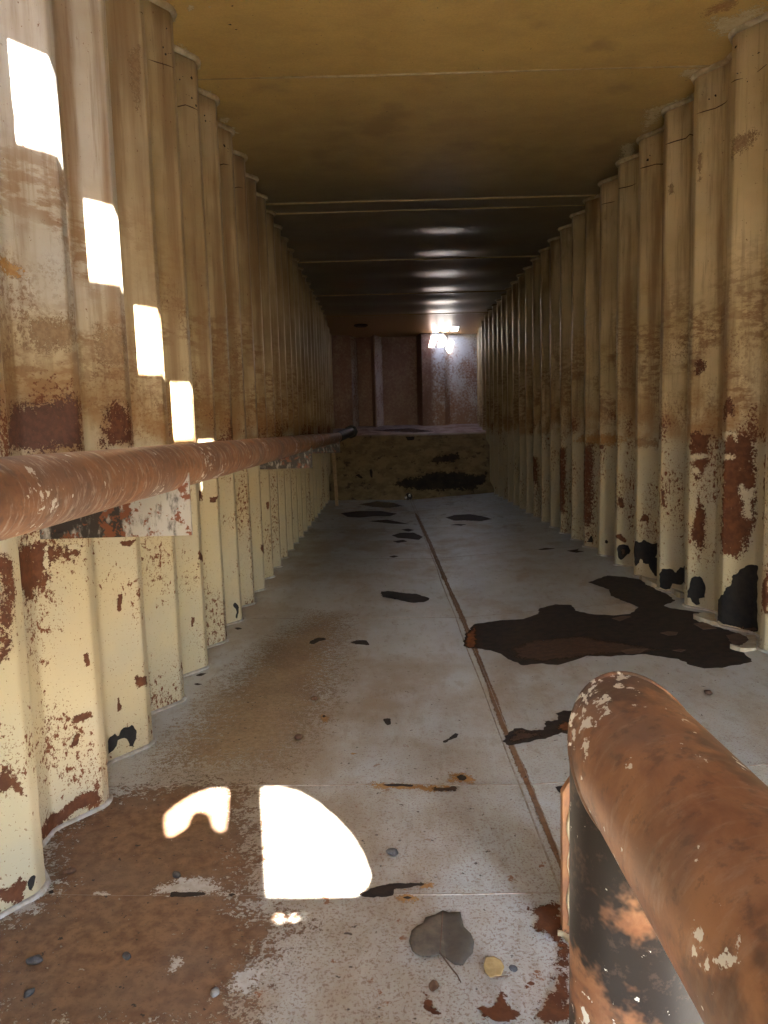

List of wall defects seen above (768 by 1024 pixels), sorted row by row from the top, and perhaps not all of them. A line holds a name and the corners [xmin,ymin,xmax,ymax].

spalling [463,396,768,668]
spalling [108,725,137,754]
corrosion [0,774,322,1024]
corrosion [477,992,521,1022]
corrosion [526,900,569,1024]